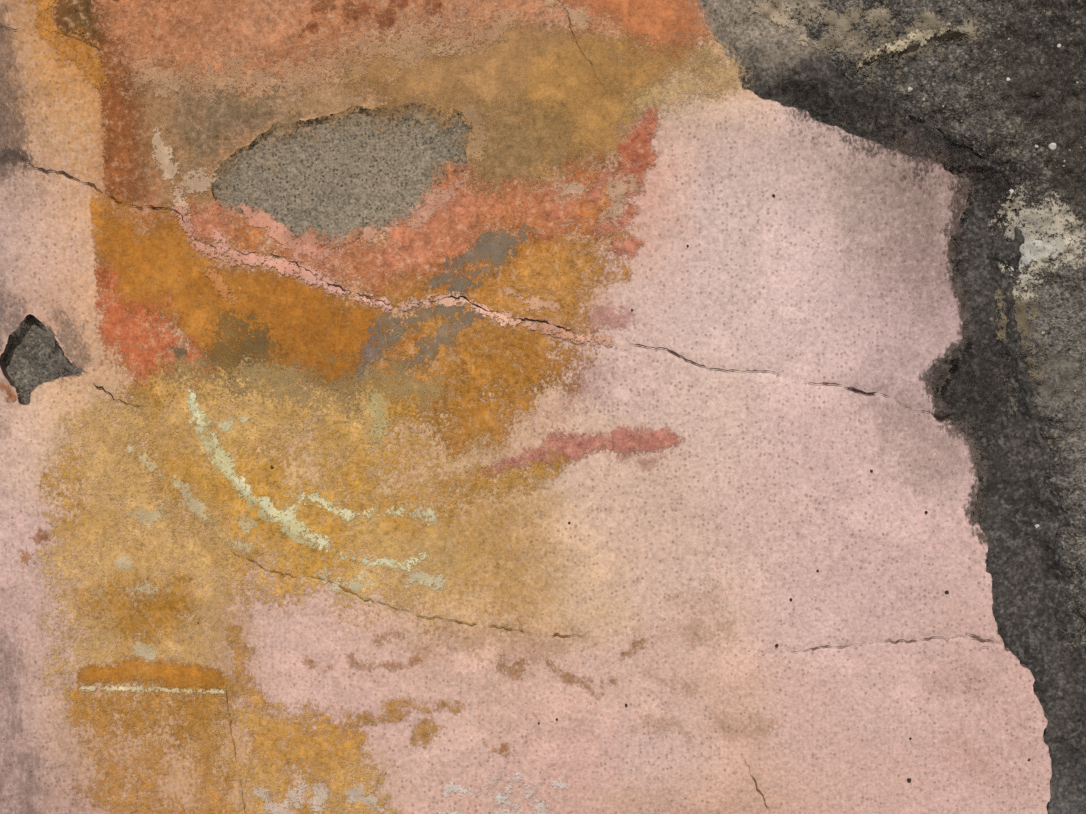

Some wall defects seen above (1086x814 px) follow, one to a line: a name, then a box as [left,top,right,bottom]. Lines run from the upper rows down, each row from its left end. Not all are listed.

rust [29,0,108,88]
spalling [747,0,990,88]
spalling [152,102,659,299]
crack [15,157,954,423]
spalling [989,186,1086,381]
spalling [4,315,84,404]
rust [348,654,420,670]
rust [496,654,527,680]
rust [546,660,615,695]
crack [778,633,999,652]